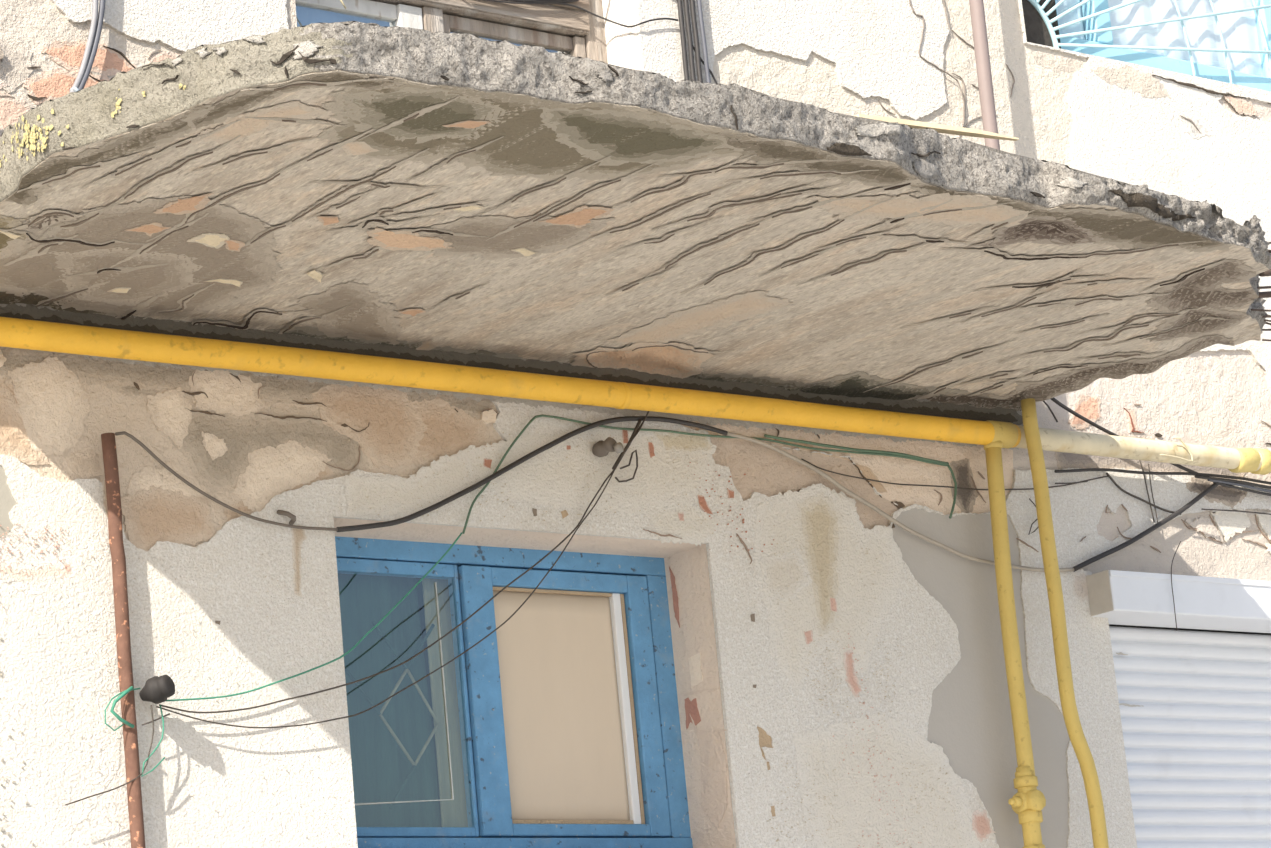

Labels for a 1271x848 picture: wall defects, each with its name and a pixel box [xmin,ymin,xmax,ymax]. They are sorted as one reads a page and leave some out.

flaking render [0,0,184,128]
crack [26,141,280,307]
crack [270,45,337,122]
crack [250,166,461,259]
crack [512,0,1015,286]
spalling [1108,190,1195,221]
crack [1153,75,1271,104]
crack [879,222,1205,394]
flaking render [926,262,1271,451]
flaking render [24,383,241,547]
flaking render [1241,472,1271,486]
flaking render [1079,506,1271,581]